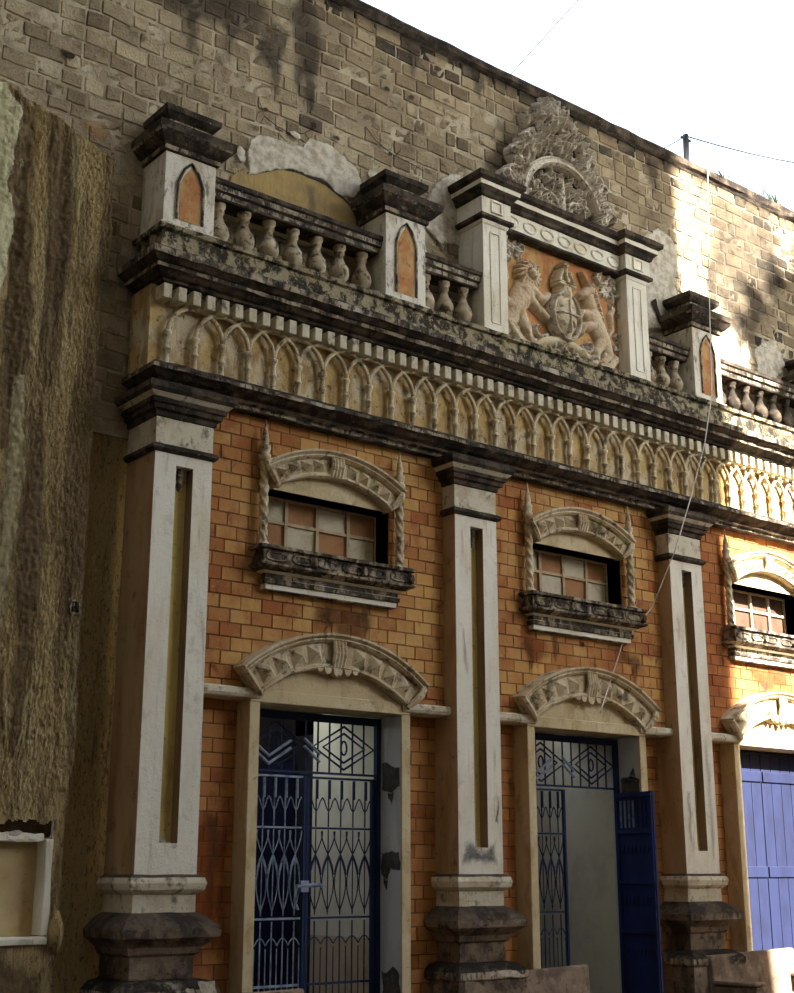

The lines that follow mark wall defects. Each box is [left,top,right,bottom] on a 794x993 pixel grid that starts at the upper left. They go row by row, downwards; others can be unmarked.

leakage [169,0,320,113]
flaking render [231,122,378,227]
leakage [0,87,73,756]
flaking render [382,762,400,804]
flaking render [381,851,401,890]
flaking render [382,967,401,993]